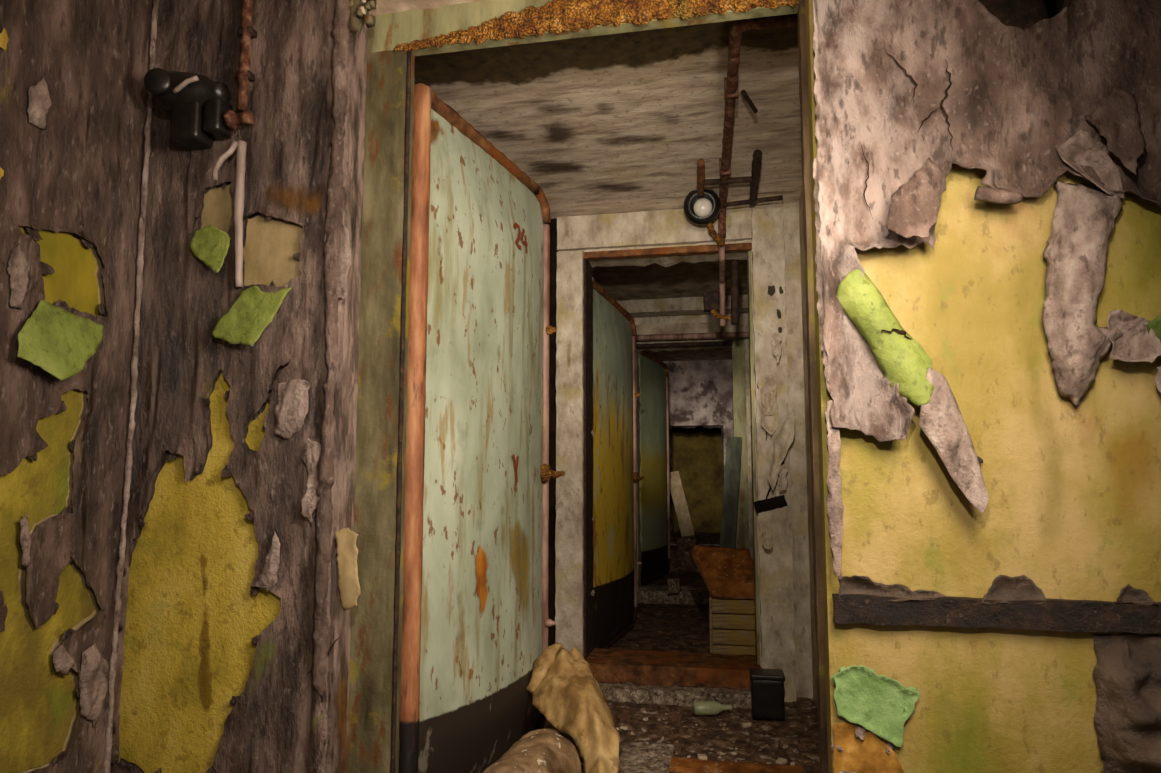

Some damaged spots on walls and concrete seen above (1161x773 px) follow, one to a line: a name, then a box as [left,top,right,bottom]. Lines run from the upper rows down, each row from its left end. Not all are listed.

rust [393,0,799,51]
rust [431,120,443,141]
water stain [531,161,582,172]
water stain [542,105,572,141]
water stain [610,136,661,144]
crack [860,143,873,219]
crack [884,48,953,150]
peeling [7,227,107,316]
peeling [813,0,1161,606]
peeling [0,372,321,773]
peeling [334,528,361,611]
rust [476,546,488,612]